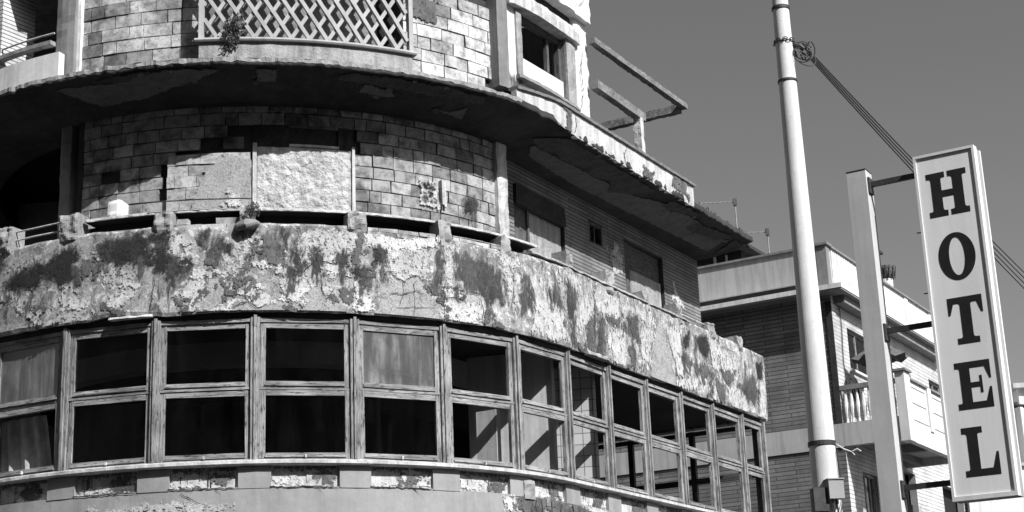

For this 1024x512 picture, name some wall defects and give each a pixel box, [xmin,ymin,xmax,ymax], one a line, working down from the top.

spalling [564,107,573,133]
flaking render [528,145,728,251]
leakage [0,244,83,316]
peeling [0,241,155,326]
leakage [95,230,193,292]
leakage [280,225,389,297]
flaking render [168,226,505,329]
crack [381,271,484,321]
leakage [431,240,579,342]
peeling [497,249,767,419]
leakage [681,330,710,366]
leakage [739,361,764,409]